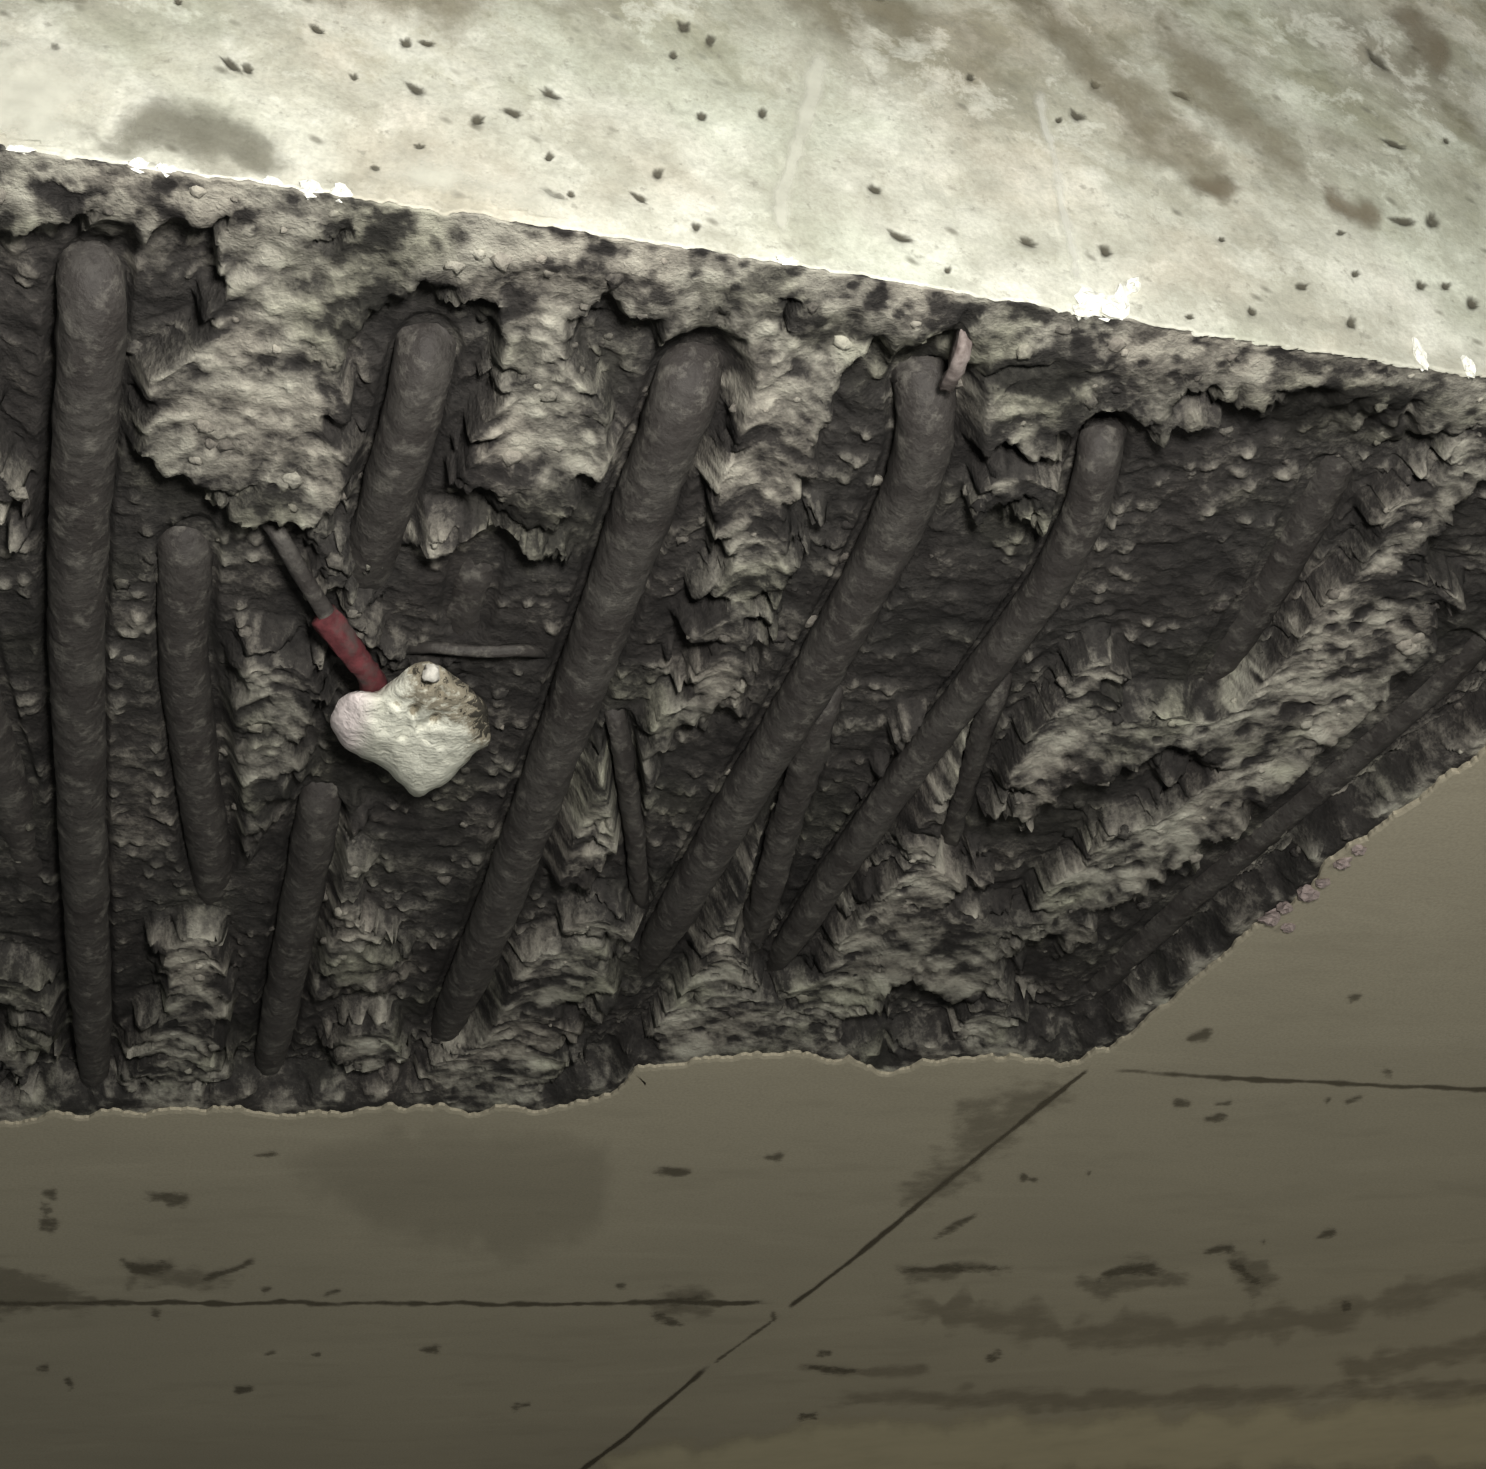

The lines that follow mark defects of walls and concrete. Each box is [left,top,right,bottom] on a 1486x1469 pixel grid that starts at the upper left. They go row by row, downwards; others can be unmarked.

leakage [125,105,273,171]
leakage [1050,27,1235,196]
leakage [1169,37,1283,154]
spalling [0,144,1486,1122]
crack [1167,1073,1486,1092]
crack [0,1072,1086,1469]